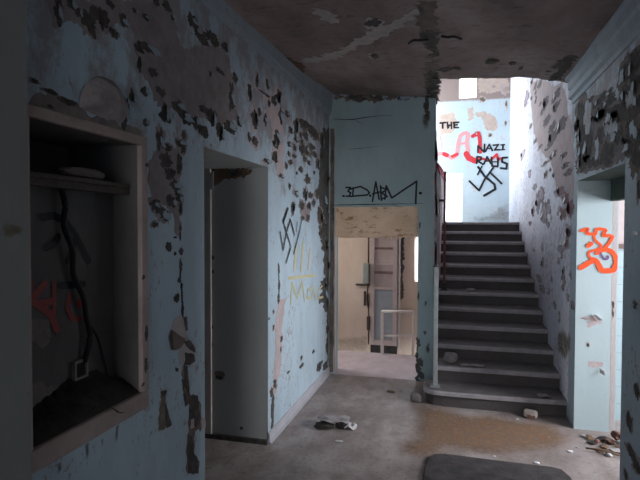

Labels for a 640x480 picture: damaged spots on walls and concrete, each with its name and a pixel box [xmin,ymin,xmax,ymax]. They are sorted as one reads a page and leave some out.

spalling [286,1,443,105]
peeling [477,78,510,109]
peeling [467,107,507,138]
peeling [28,0,335,382]
peeling [523,45,640,310]
spalling [415,331,430,381]
peeling [158,390,172,431]
peeling [169,314,206,475]
water stain [408,410,561,454]
peeling [625,410,634,434]
peeling [623,441,640,480]